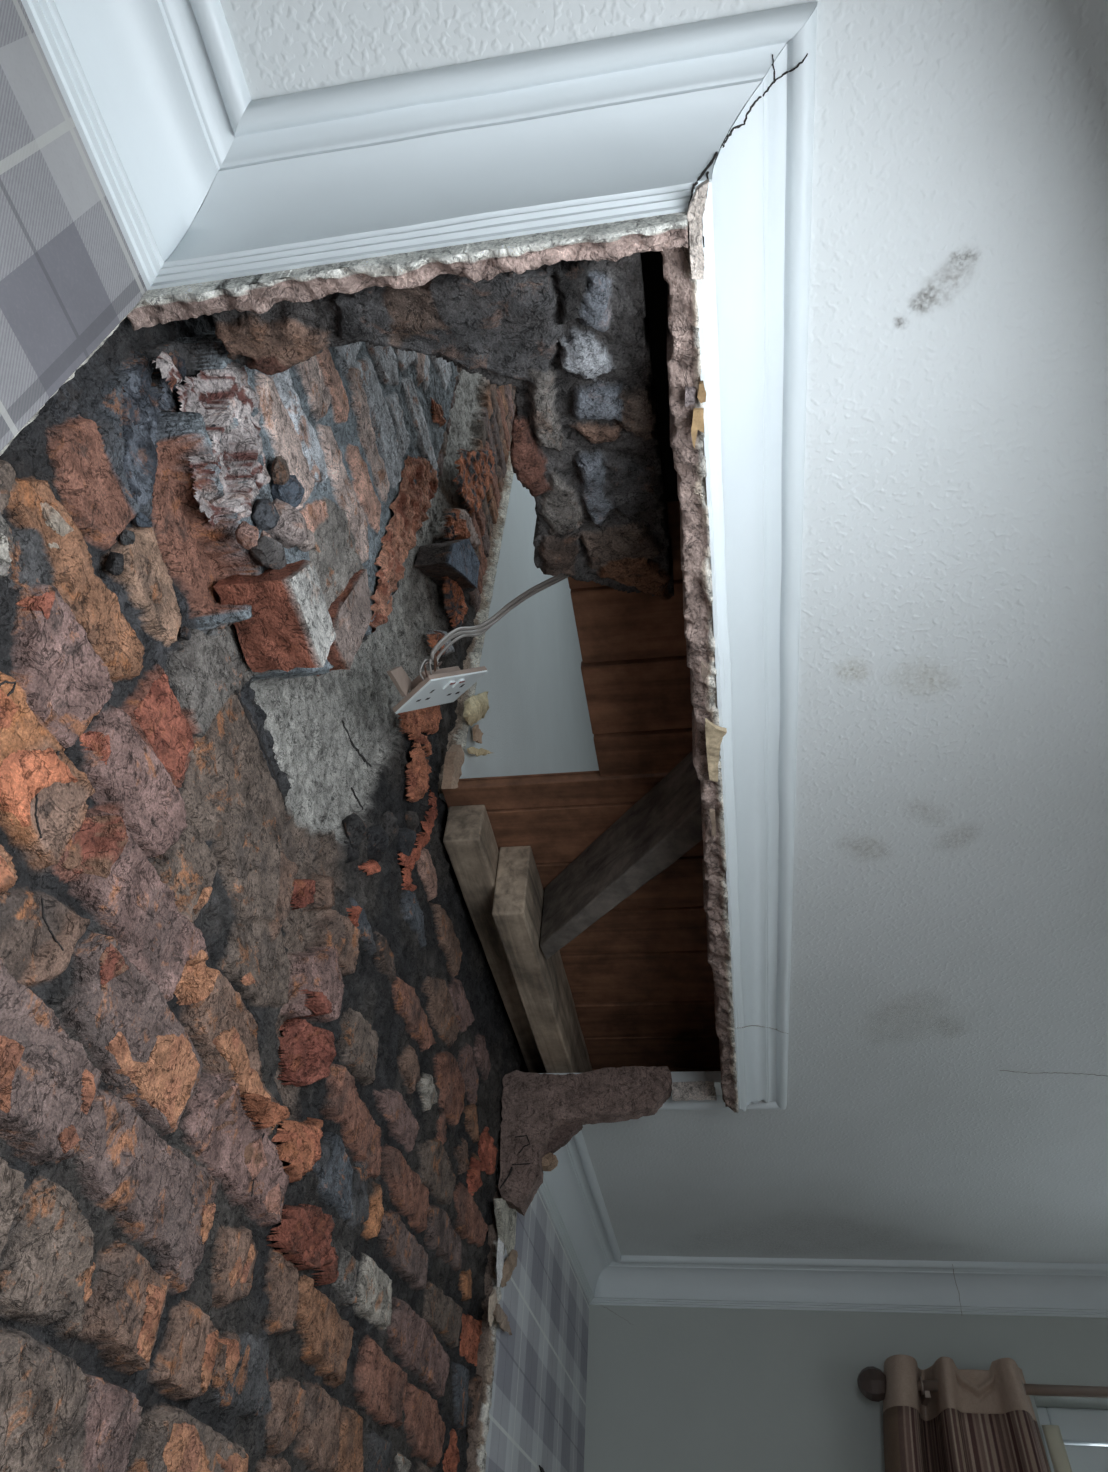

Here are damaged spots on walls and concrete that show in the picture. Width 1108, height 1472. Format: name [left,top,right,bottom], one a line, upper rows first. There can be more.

crack [688,53,808,247]
flaking render [0,178,739,1472]